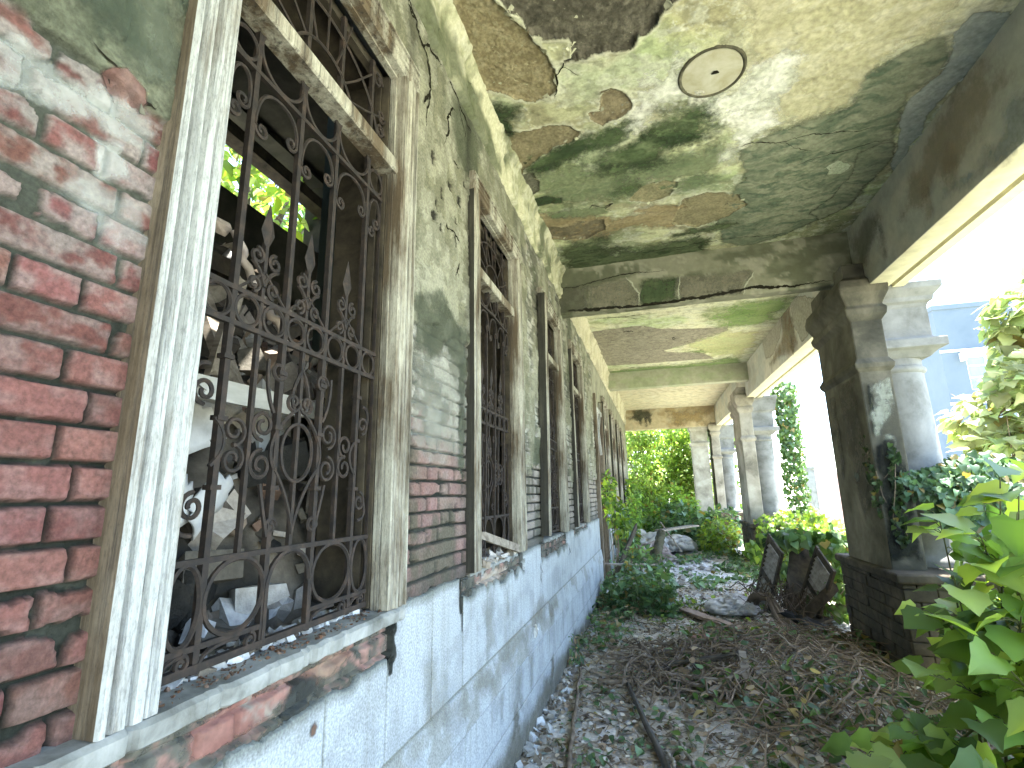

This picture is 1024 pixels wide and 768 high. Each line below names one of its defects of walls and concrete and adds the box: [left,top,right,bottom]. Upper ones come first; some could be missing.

spalling [101,67,149,115]
crack [408,0,471,168]
peeling [453,0,556,103]
leakage [492,102,523,136]
peeling [505,125,584,174]
peeling [588,88,632,126]
leakage [523,0,959,269]
crack [732,125,888,165]
peeling [630,180,747,227]
crack [565,226,830,319]
leakage [830,380,923,560]
spalling [107,628,387,768]